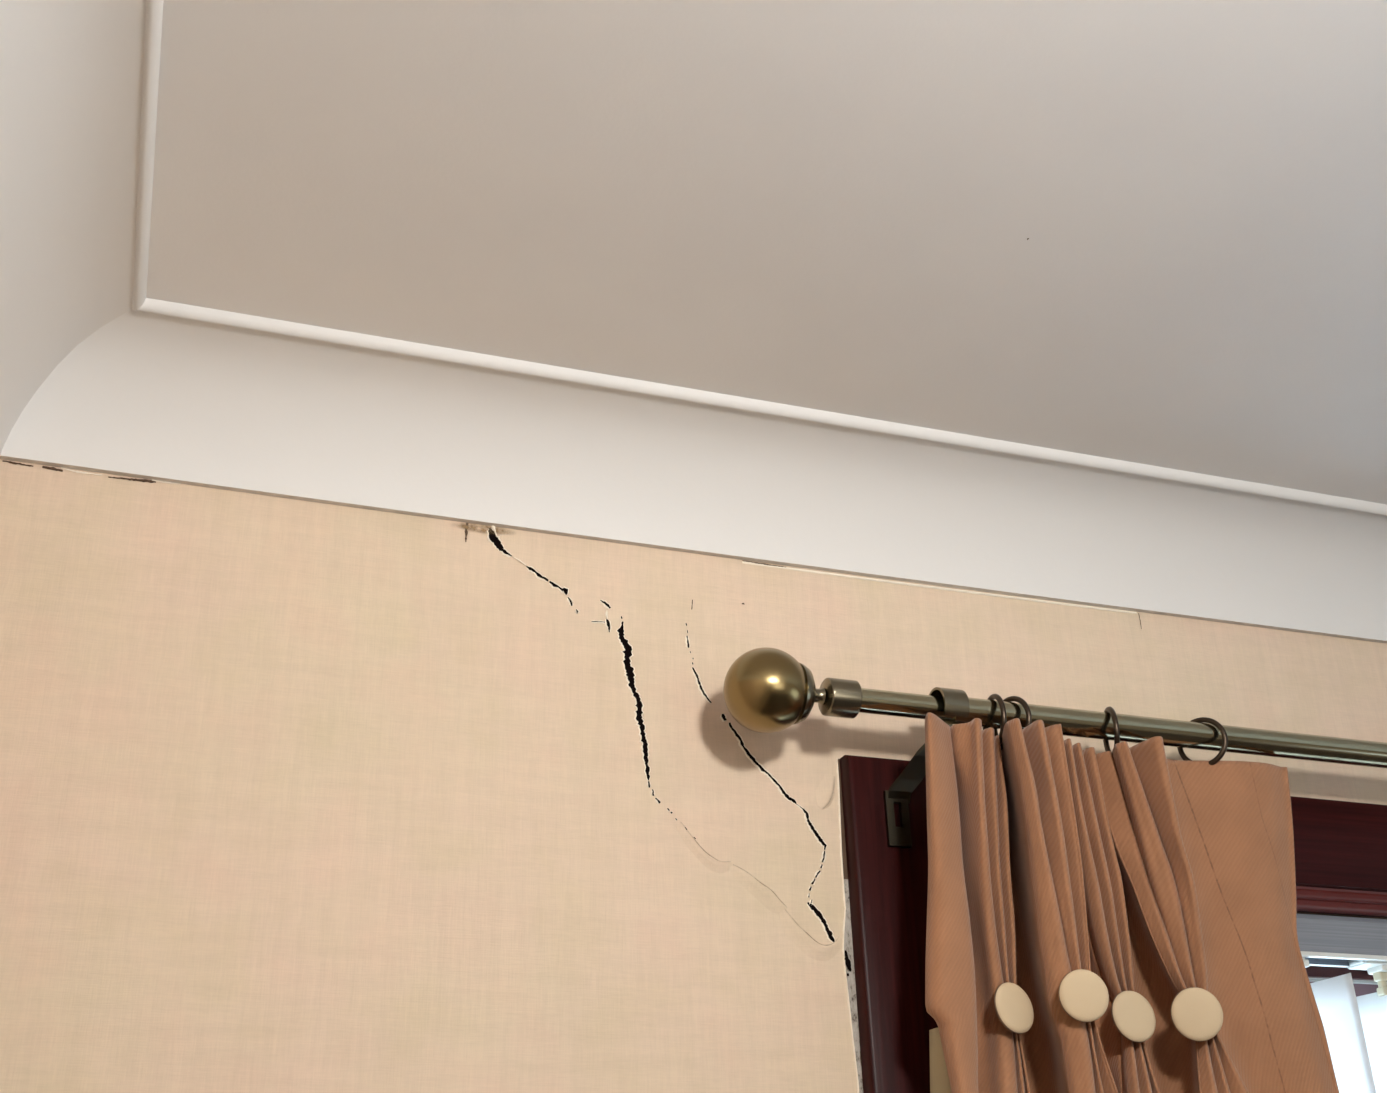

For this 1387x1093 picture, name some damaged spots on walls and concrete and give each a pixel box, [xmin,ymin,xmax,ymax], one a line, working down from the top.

crack [486,526,696,839]
crack [685,600,835,943]